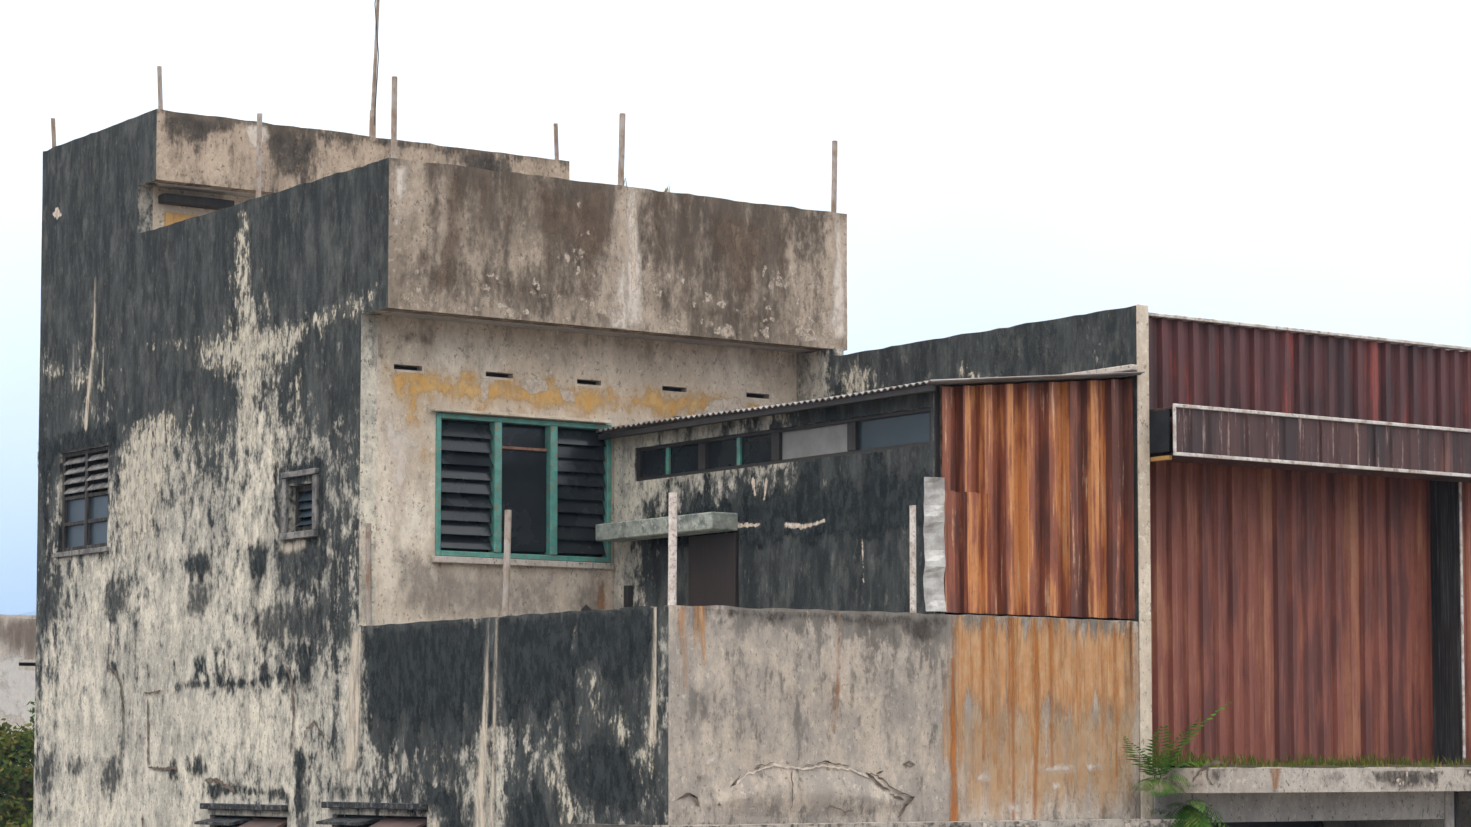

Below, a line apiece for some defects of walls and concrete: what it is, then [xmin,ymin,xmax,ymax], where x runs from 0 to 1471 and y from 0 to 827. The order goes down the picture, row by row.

leakage [272,133,325,183]
leakage [437,153,510,288]
leakage [544,184,609,274]
leakage [612,188,642,329]
leakage [832,224,845,338]
leakage [332,607,657,827]
rust [943,615,1138,821]
leakage [207,746,310,827]
crack [677,760,915,817]